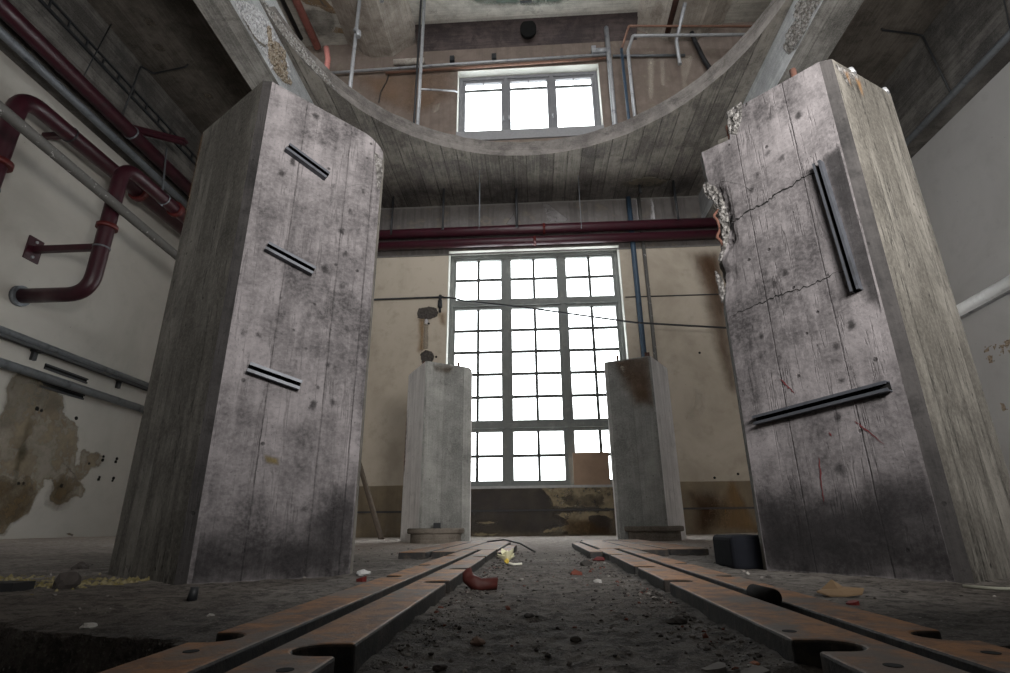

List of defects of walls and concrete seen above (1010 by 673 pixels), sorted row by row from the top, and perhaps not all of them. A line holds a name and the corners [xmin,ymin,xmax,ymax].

spalling [234,0,338,92]
spalling [783,0,821,55]
spalling [726,102,742,135]
crack [720,173,815,226]
spalling [703,182,730,303]
crack [737,271,844,313]